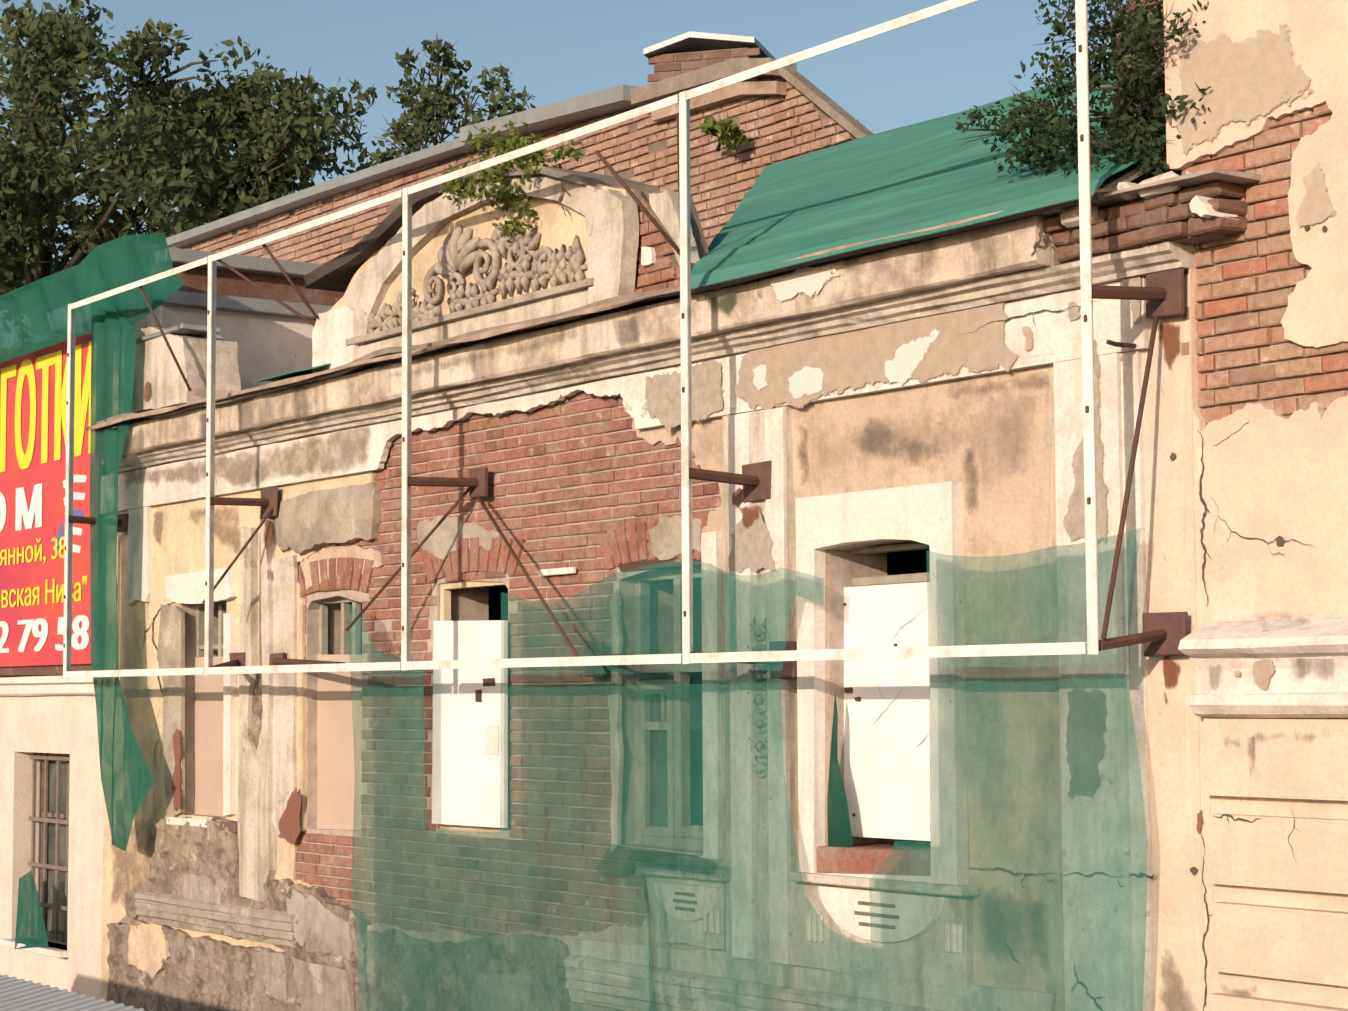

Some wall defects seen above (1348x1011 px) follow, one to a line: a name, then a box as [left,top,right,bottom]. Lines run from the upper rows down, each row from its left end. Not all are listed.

flaking render [1035,103,1348,446]
peeling [1063,339,1108,542]
crack [1198,431,1315,605]
flaking render [106,302,1033,1011]
crack [1201,814,1260,1011]